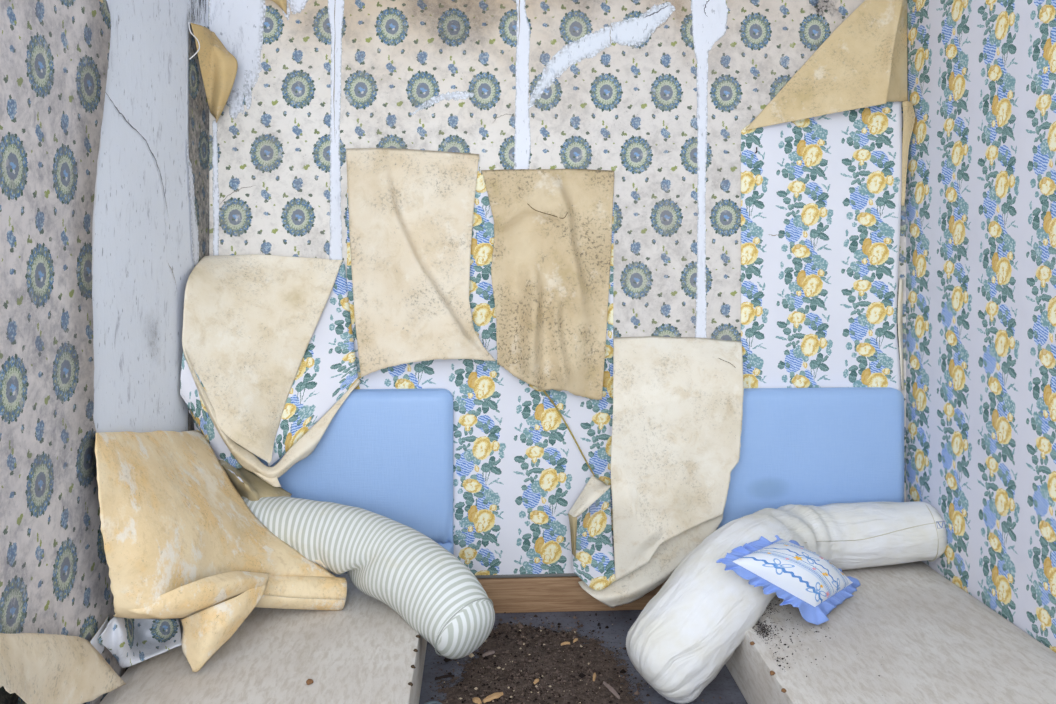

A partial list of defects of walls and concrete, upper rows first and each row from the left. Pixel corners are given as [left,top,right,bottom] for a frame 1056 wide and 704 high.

crack [106,93,168,212]
flaking render [191,0,307,256]
flaking render [328,0,344,260]
spalling [412,91,474,114]
spalling [514,0,675,169]
flaking render [691,0,728,338]